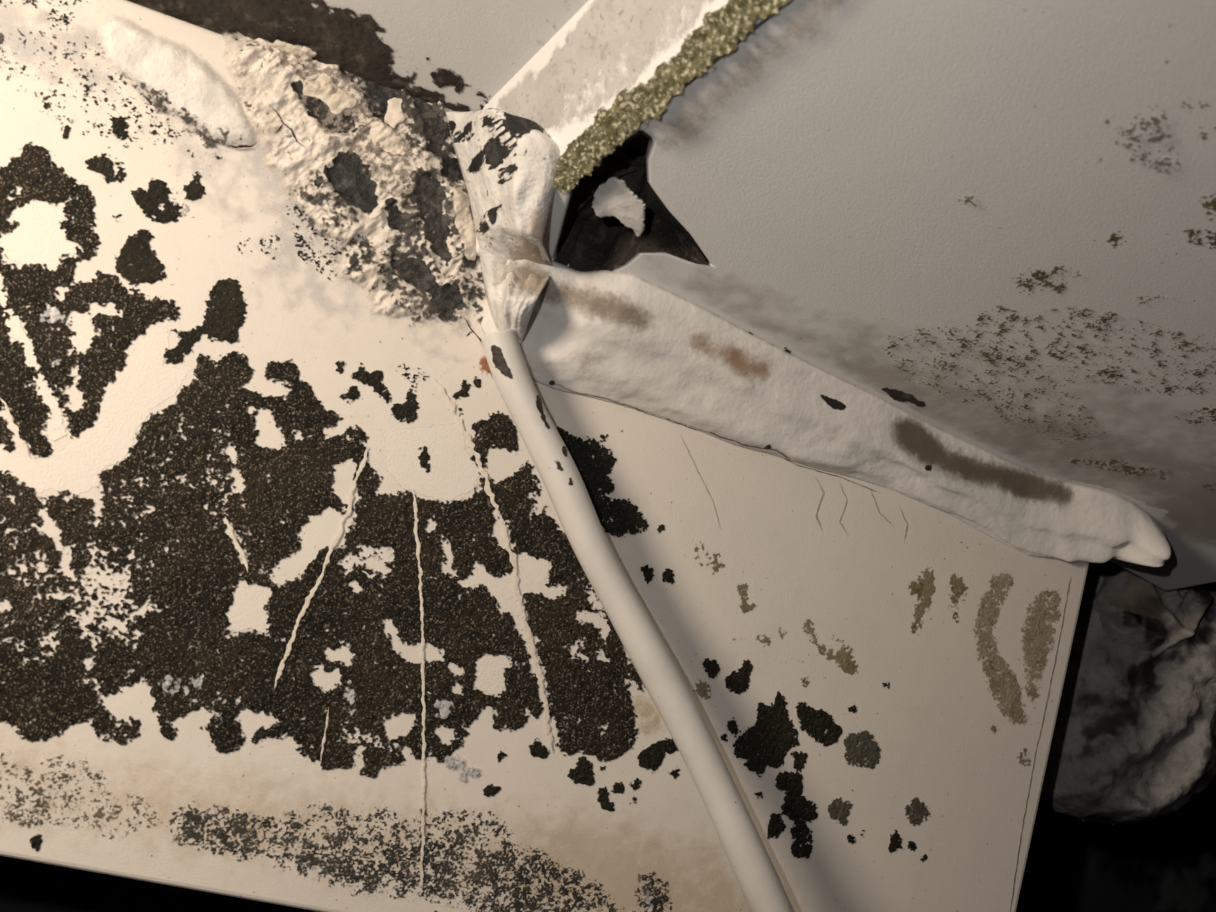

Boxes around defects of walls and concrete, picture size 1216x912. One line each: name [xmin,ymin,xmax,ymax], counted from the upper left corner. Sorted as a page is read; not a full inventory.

flaking render [224,33,485,327]
spalling [554,131,709,272]
damp [0,0,680,912]
damp [1071,458,1173,480]
damp [702,658,753,695]
damp [720,691,881,859]
damp [888,797,930,862]